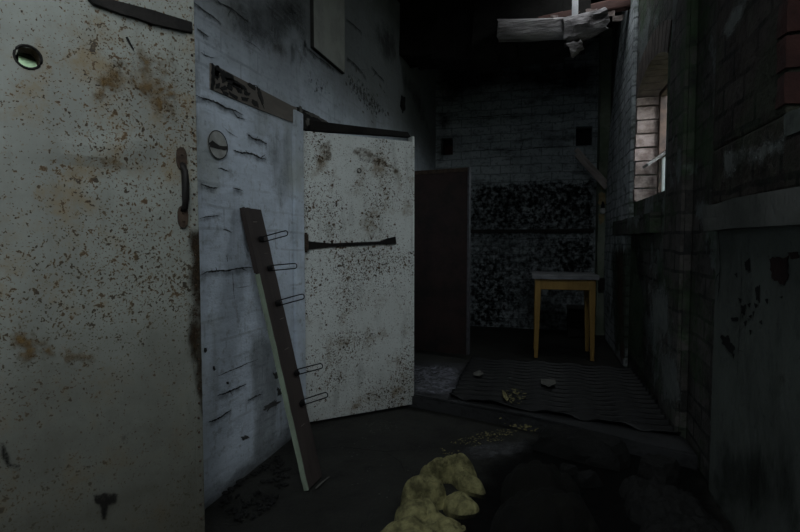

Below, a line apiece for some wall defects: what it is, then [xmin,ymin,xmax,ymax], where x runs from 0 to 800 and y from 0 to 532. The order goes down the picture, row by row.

crack [196,95,267,159]
crack [202,258,253,291]
crack [209,359,261,422]